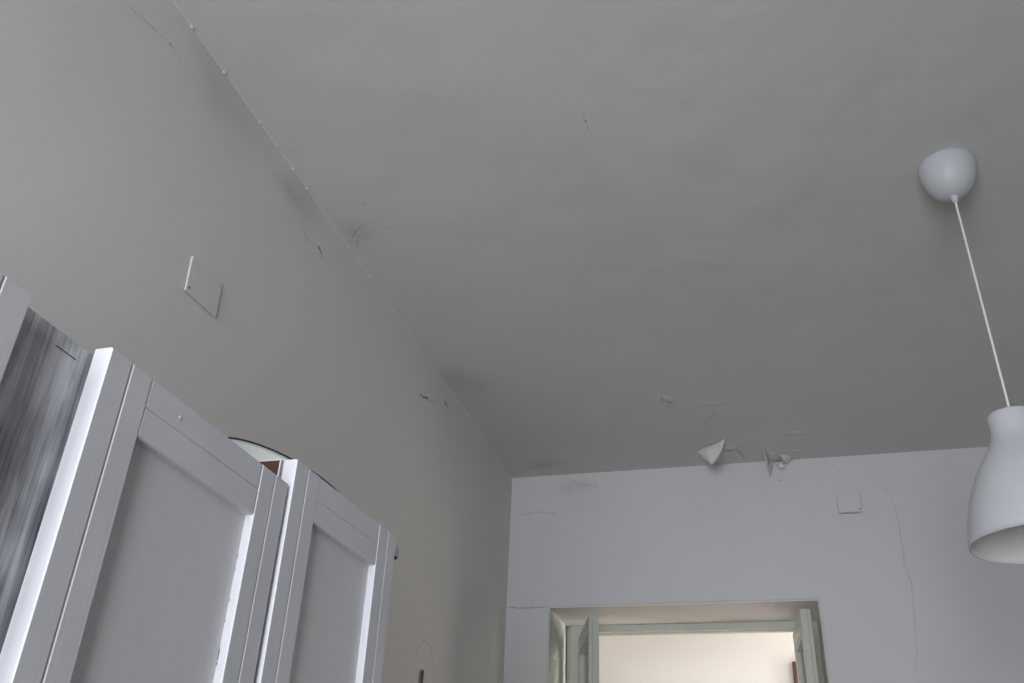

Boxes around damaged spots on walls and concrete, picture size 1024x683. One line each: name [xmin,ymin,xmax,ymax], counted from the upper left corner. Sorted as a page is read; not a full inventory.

peeling [696,439,738,466]